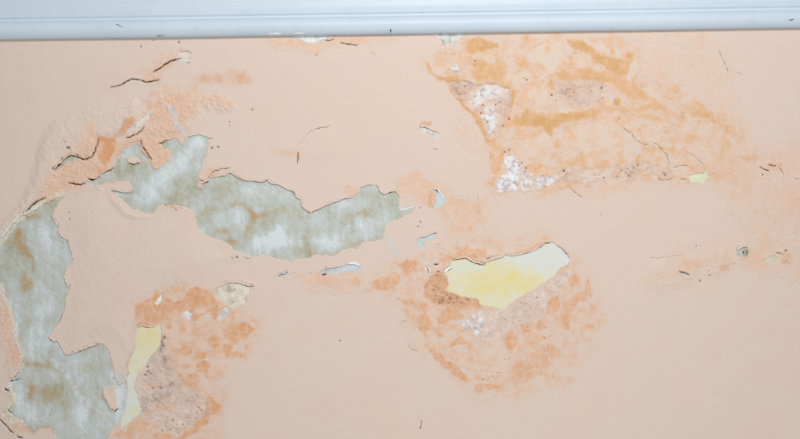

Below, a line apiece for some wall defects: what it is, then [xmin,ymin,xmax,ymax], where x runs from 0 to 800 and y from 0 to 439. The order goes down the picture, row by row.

peeling [0,189,214,439]
water stain [108,276,269,439]
peeling [214,280,253,320]
peeling [86,132,414,262]
peeling [321,262,361,275]
peeling [423,242,570,311]
water stain [294,29,800,406]